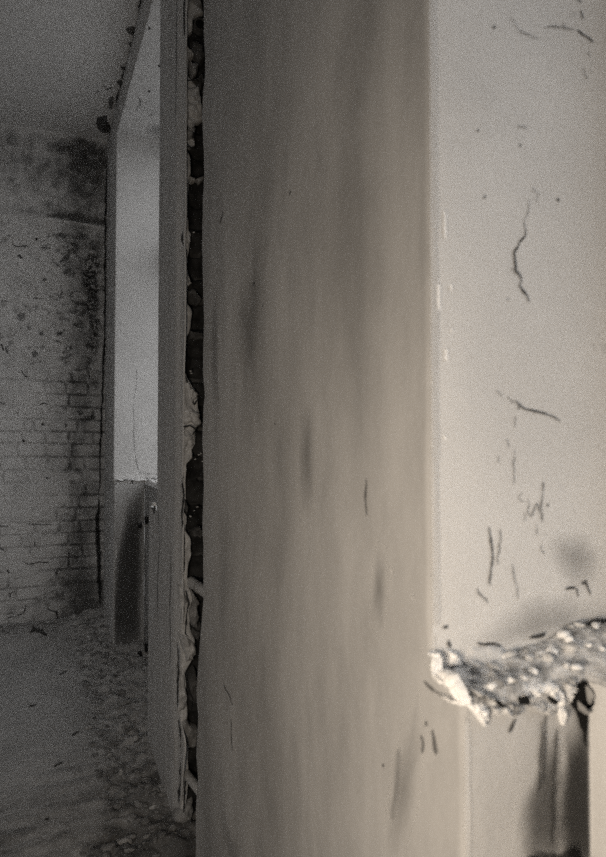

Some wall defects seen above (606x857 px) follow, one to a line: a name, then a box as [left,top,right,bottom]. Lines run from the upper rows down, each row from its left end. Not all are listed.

crack [513,0,594,79]
crack [512,188,540,302]
leakage [83,257,98,347]
crack [497,391,561,422]
crack [498,439,544,553]
crack [477,528,518,604]
spalling [427,645,595,746]
leakage [532,714,589,857]